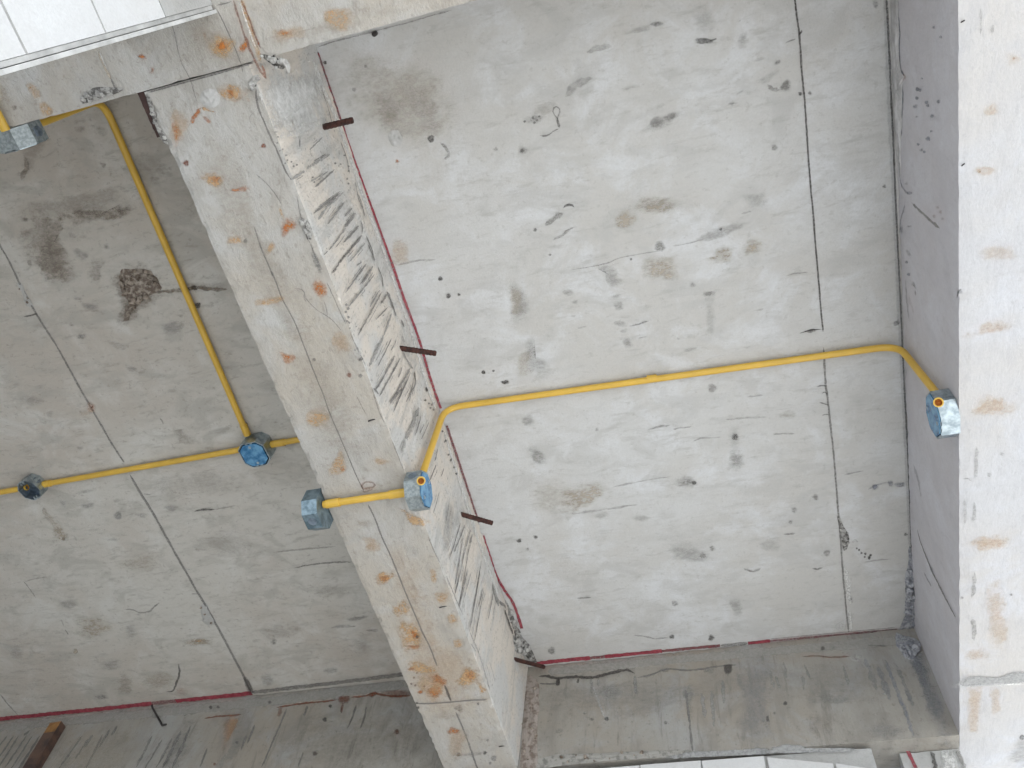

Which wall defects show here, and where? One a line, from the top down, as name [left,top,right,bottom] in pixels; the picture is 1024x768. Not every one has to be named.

spalling [434,494,545,669]
spalling [895,533,921,660]